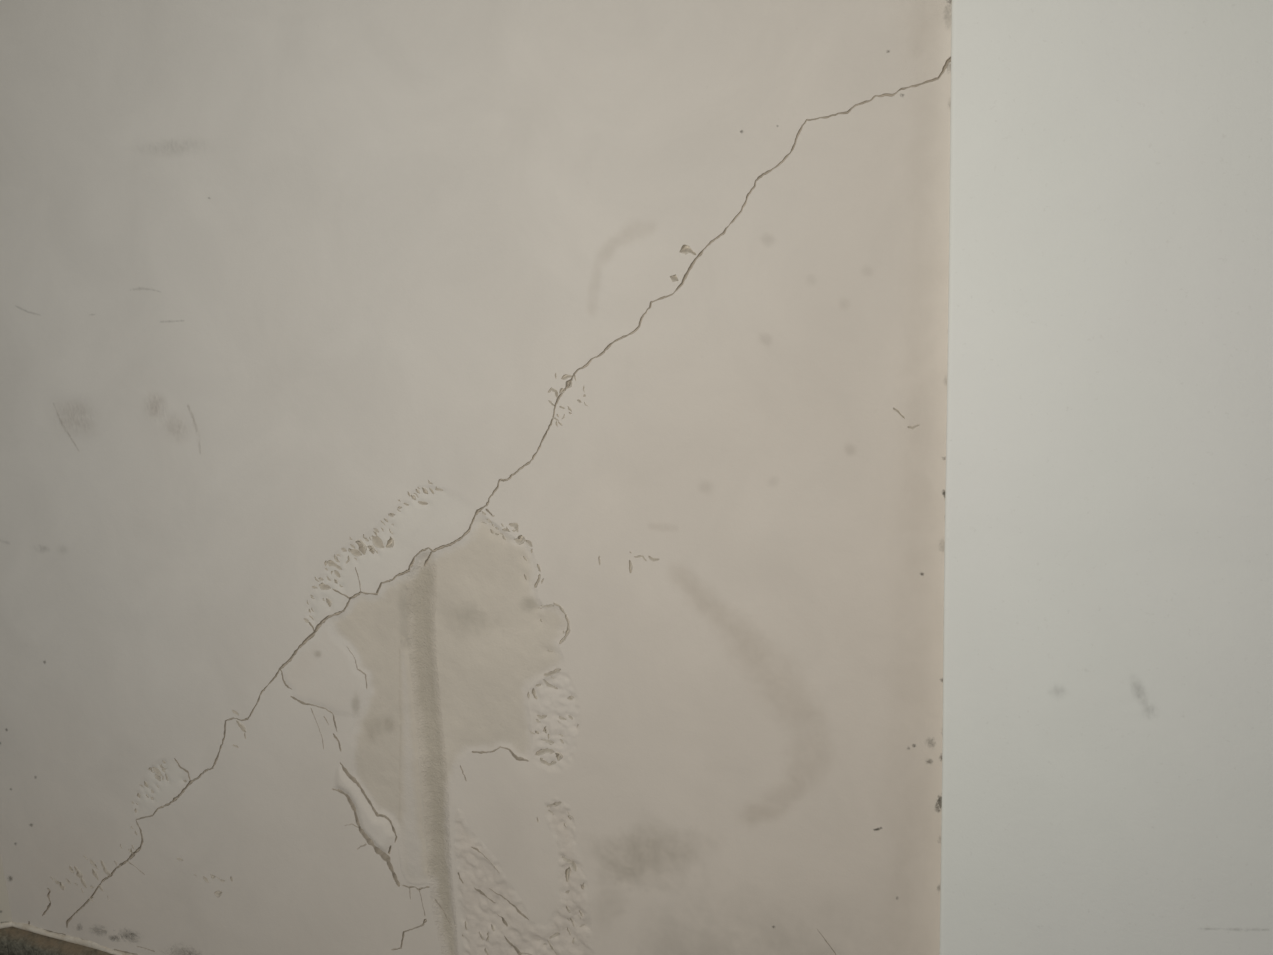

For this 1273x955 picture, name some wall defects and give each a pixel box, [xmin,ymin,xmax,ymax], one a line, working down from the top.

spalling [282,480,595,955]
crack [28,57,951,955]